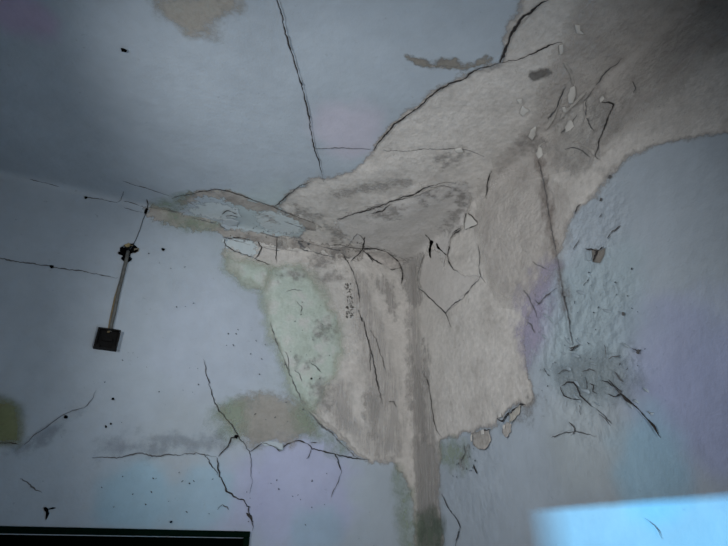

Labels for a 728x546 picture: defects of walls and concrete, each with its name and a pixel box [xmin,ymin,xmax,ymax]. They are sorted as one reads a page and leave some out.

crack [88,0,562,224]
crack [0,391,96,445]
crack [0,258,118,278]
crack [95,362,368,531]
damp [226,259,342,409]
damp [403,322,443,546]
peeling [146,0,728,546]
crack [544,345,661,438]